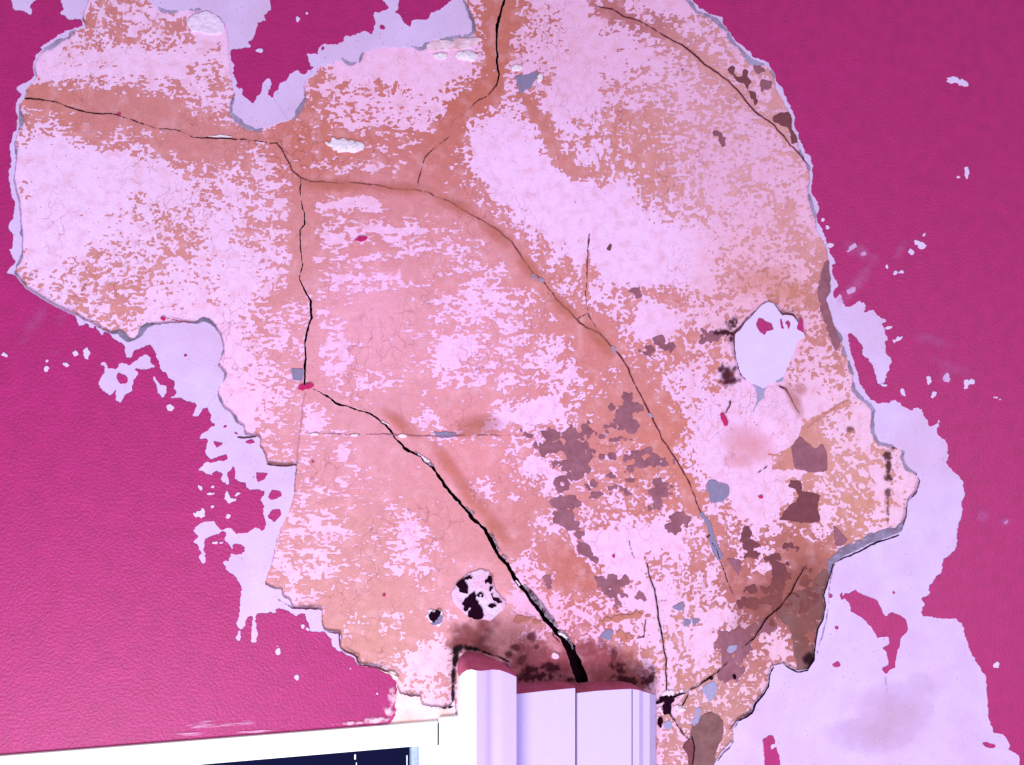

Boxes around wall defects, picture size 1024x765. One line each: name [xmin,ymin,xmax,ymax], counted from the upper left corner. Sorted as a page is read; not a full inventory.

crack [461,0,504,116]
crack [598,6,806,162]
damp [714,317,738,342]
crack [730,302,798,379]
peeling [99,355,155,403]
peeling [166,372,216,417]
crack [25,98,733,697]
damp [718,365,741,386]
damp [443,575,576,709]
damp [610,650,655,690]
flaking render [670,694,692,742]
flaking render [737,675,769,716]